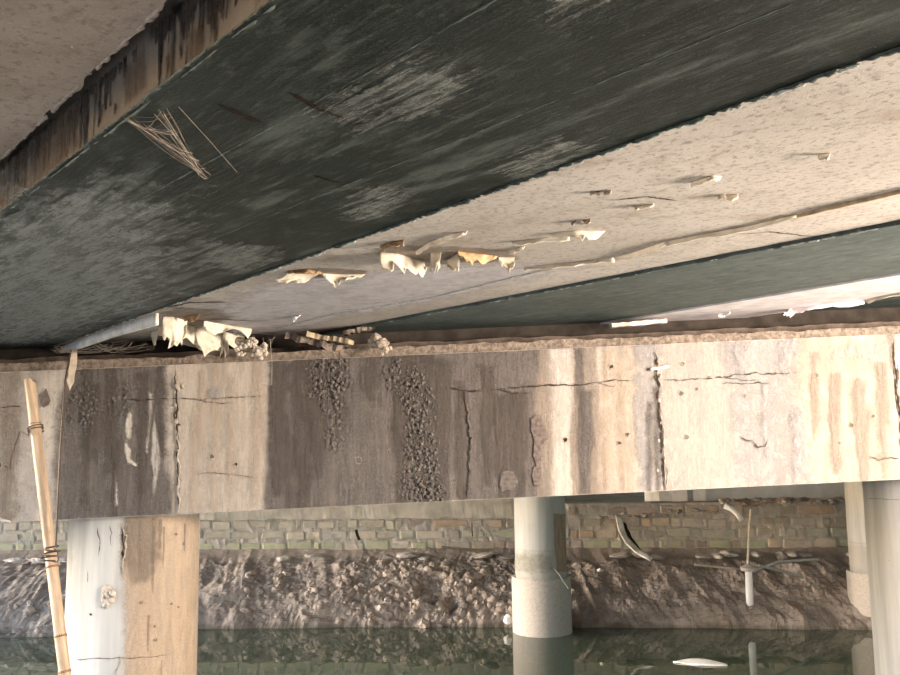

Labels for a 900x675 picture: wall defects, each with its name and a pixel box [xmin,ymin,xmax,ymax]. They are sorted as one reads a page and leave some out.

peeling [718,194,739,202]
peeling [151,314,252,357]
peeling [274,269,365,288]
leakage [213,263,565,337]
peeling [380,214,797,277]
leakage [0,372,20,521]
crack [129,369,261,514]
crack [449,353,796,490]
leakage [634,340,811,491]